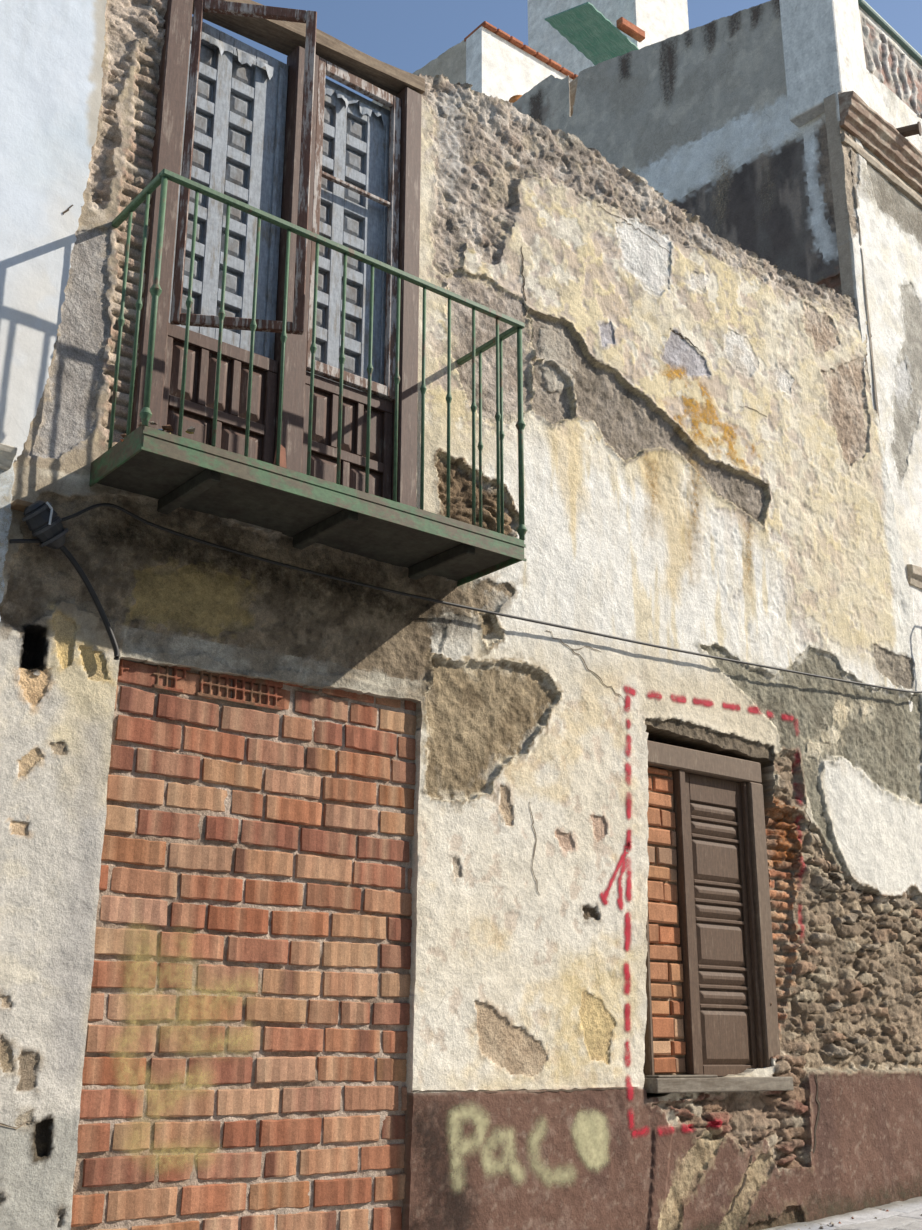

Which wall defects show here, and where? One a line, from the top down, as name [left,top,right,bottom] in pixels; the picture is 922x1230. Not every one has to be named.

leakage [530,91,542,120]
leakage [620,53,630,79]
leakage [659,0,780,100]
flaking render [89,0,168,444]
flaking render [419,73,859,425]
peeling [820,357,871,466]
peeling [891,282,922,482]
spalling [435,452,519,538]
spalling [499,785,514,826]
peeling [644,644,922,878]
flaking render [765,807,801,1023]
spalling [474,1000,549,1077]